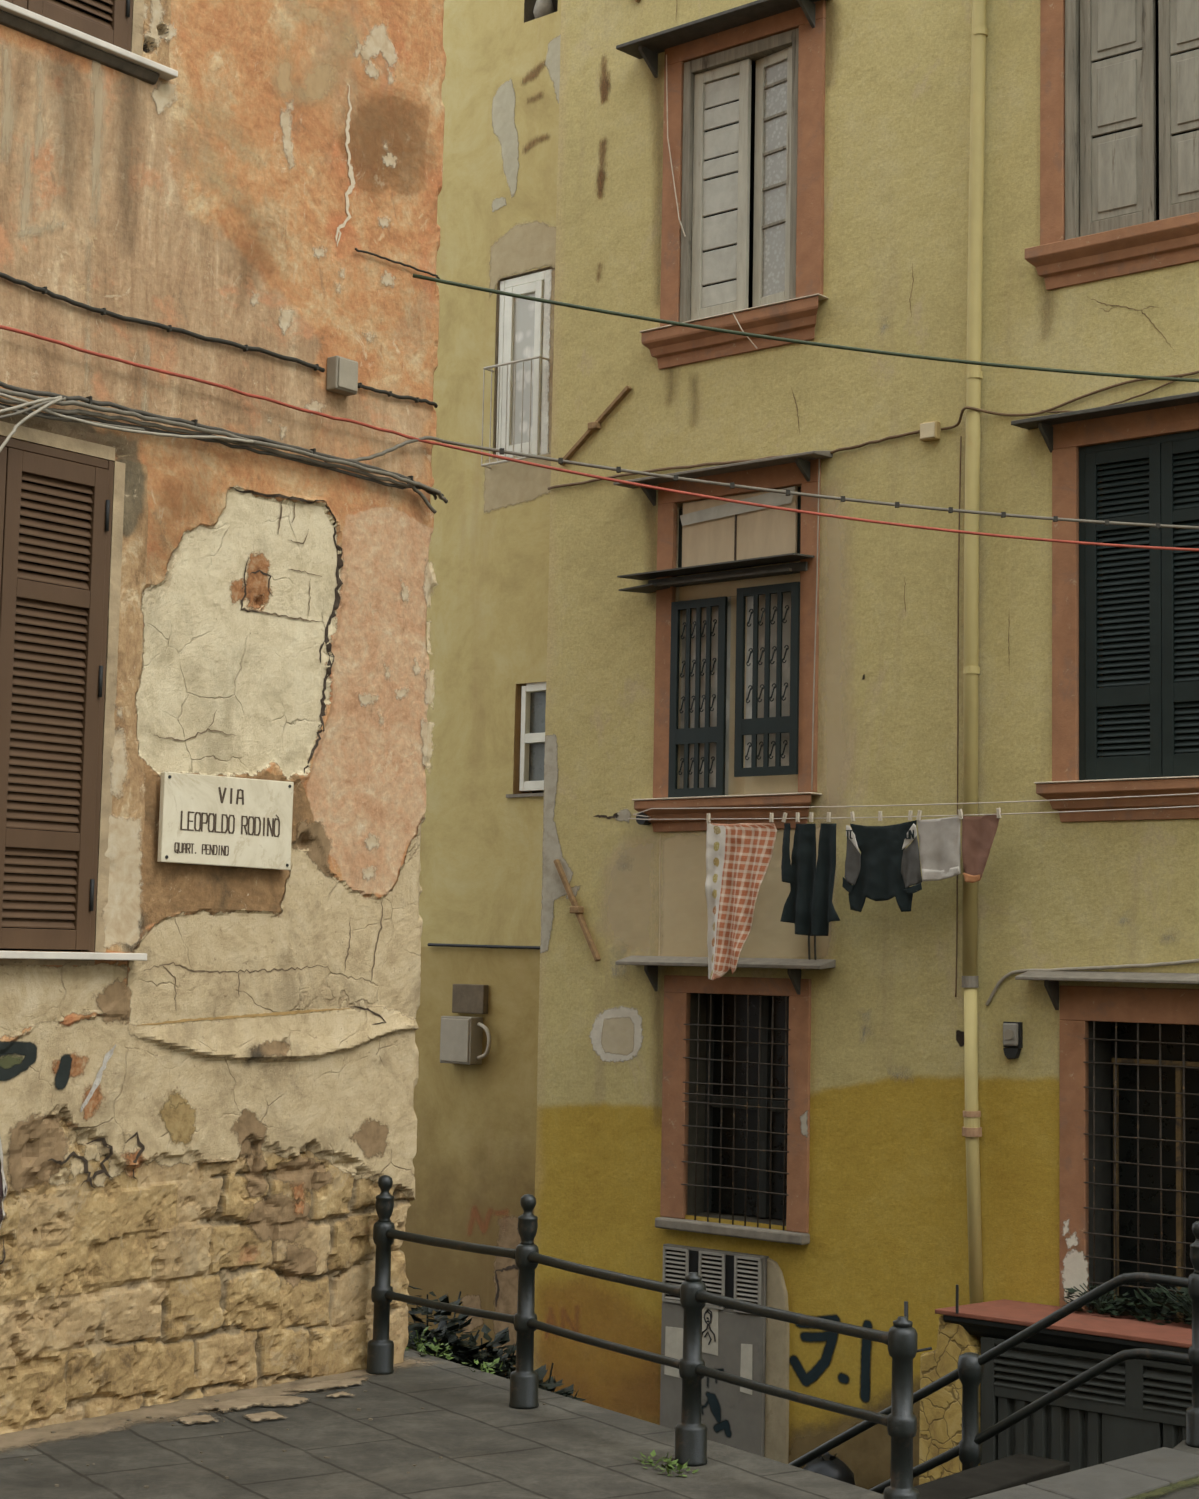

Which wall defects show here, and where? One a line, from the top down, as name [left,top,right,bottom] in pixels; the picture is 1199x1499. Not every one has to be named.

peeling [355,24,397,85]
crack [335,84,356,246]
flaking render [492,79,519,212]
flaking render [109,485,345,799]
crack [229,487,343,774]
peeling [359,562,438,771]
flaking render [0,813,426,1435]
flaking render [461,1216,534,1366]
peeling [1061,1219,1089,1303]